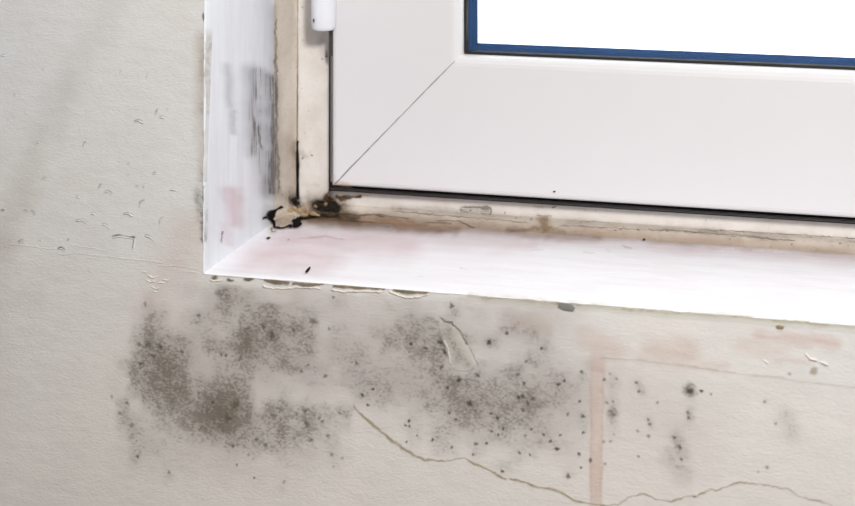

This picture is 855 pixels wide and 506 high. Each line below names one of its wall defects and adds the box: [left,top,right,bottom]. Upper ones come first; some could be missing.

damp [252,58,280,195]
damp [289,193,475,231]
damp [133,333,184,403]
damp [240,316,281,354]
peeling [439,317,476,371]
damp [198,388,248,435]
crack [354,406,585,503]